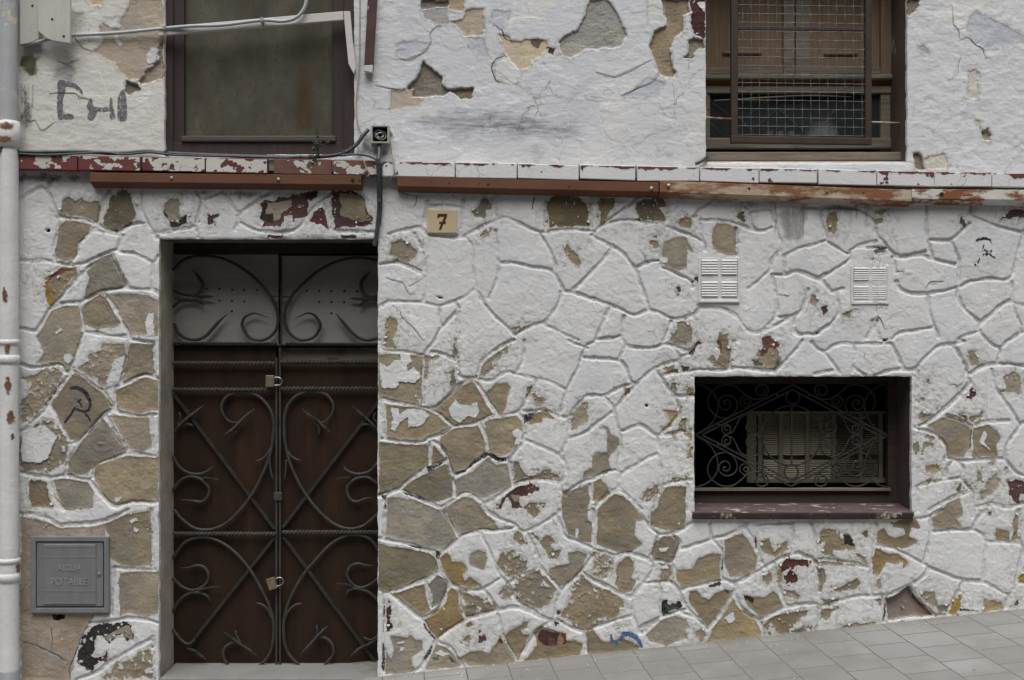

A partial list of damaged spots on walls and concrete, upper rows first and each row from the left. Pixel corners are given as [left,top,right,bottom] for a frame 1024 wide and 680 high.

peeling [94,0,165,95]
spalling [391,62,473,110]
spalling [420,0,626,84]
spalling [625,0,705,97]
peeling [21,156,267,173]
peeling [287,160,321,173]
peeling [259,190,373,238]
peeling [19,188,159,680]
peeling [378,310,965,674]
peeling [982,599,1019,612]